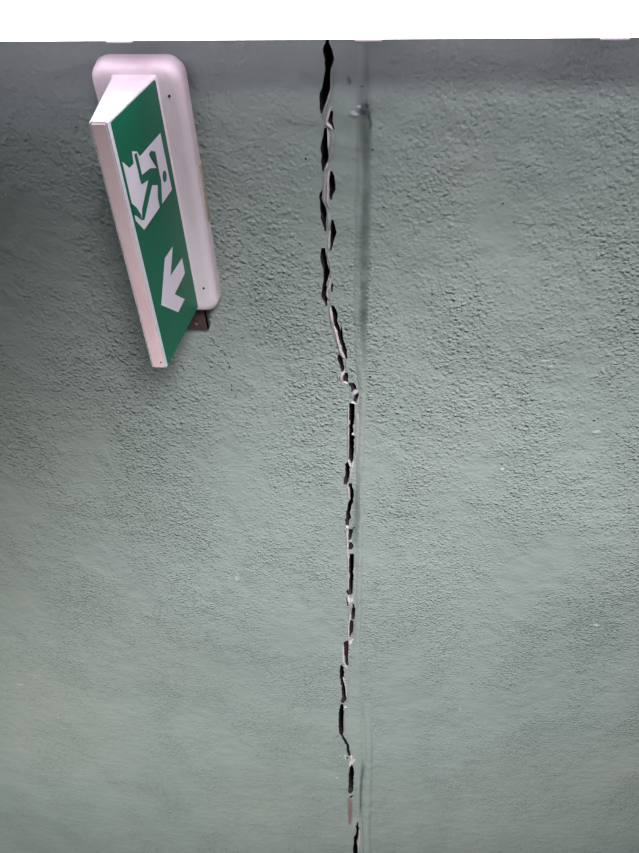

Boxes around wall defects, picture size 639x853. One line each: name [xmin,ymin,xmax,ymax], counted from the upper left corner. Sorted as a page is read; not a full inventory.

crack [319,39,359,798]
crack [352,819,360,853]